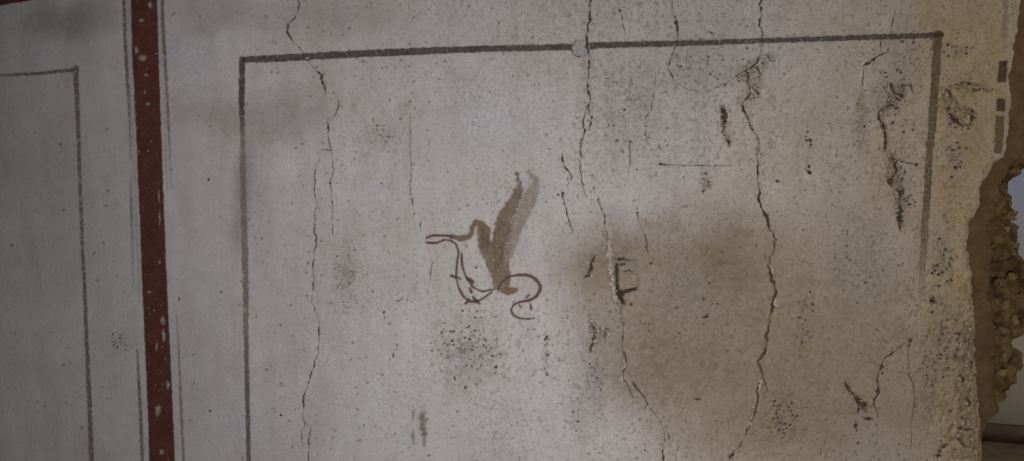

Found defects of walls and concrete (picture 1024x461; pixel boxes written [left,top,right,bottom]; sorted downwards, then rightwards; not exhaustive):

crack [286,0,341,460]
crack [557,0,608,246]
crack [628,0,778,460]
crack [857,11,895,147]
flaking render [920,0,1024,457]
crack [604,304,677,461]
crack [873,338,916,447]